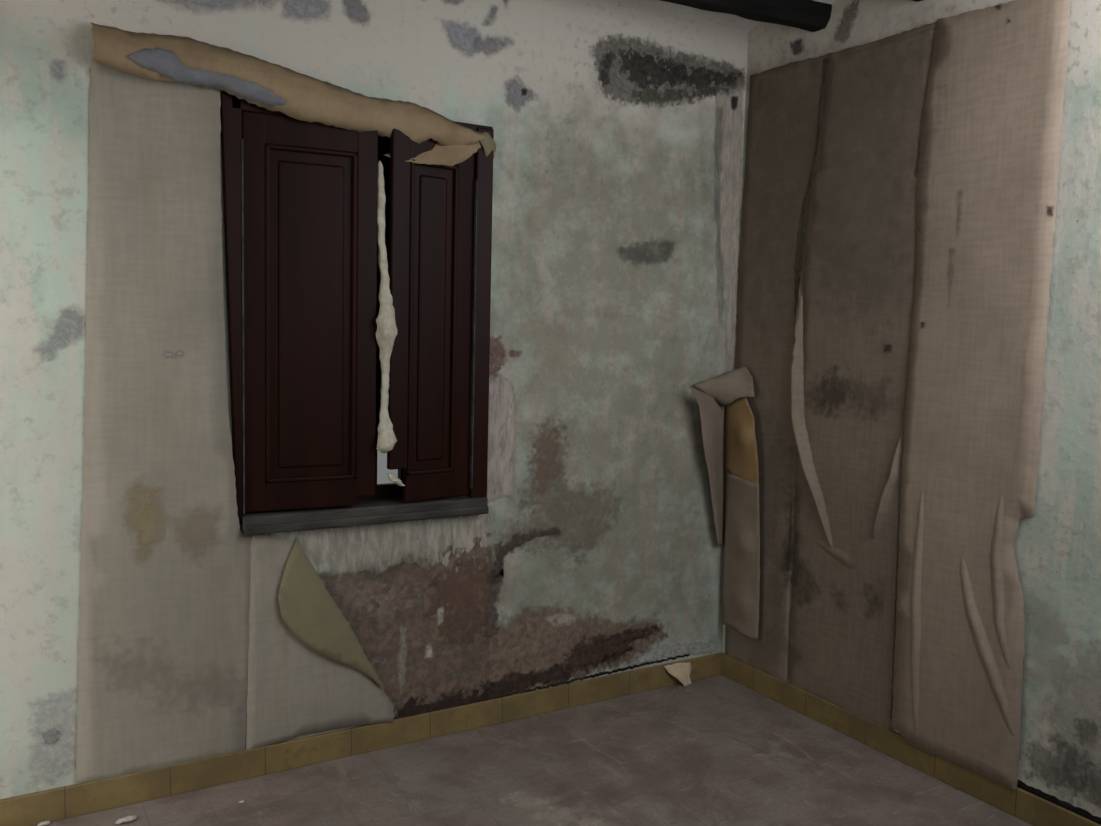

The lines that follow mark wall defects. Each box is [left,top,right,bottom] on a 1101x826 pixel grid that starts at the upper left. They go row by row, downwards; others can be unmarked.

flaking render [284,374,717,718]
damp [1026,650,1101,805]